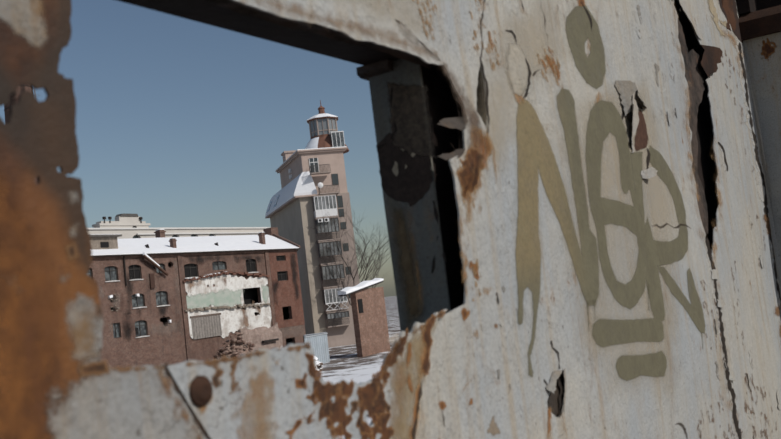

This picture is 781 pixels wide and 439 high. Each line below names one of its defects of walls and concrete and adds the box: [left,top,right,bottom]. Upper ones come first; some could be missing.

crack [480,0,517,57]
rust [538,48,560,86]
rust [761,38,777,59]
peeling [376,133,433,207]
rust [457,128,496,213]
peeling [615,80,658,179]
crack [655,223,749,439]
rust [278,311,445,439]